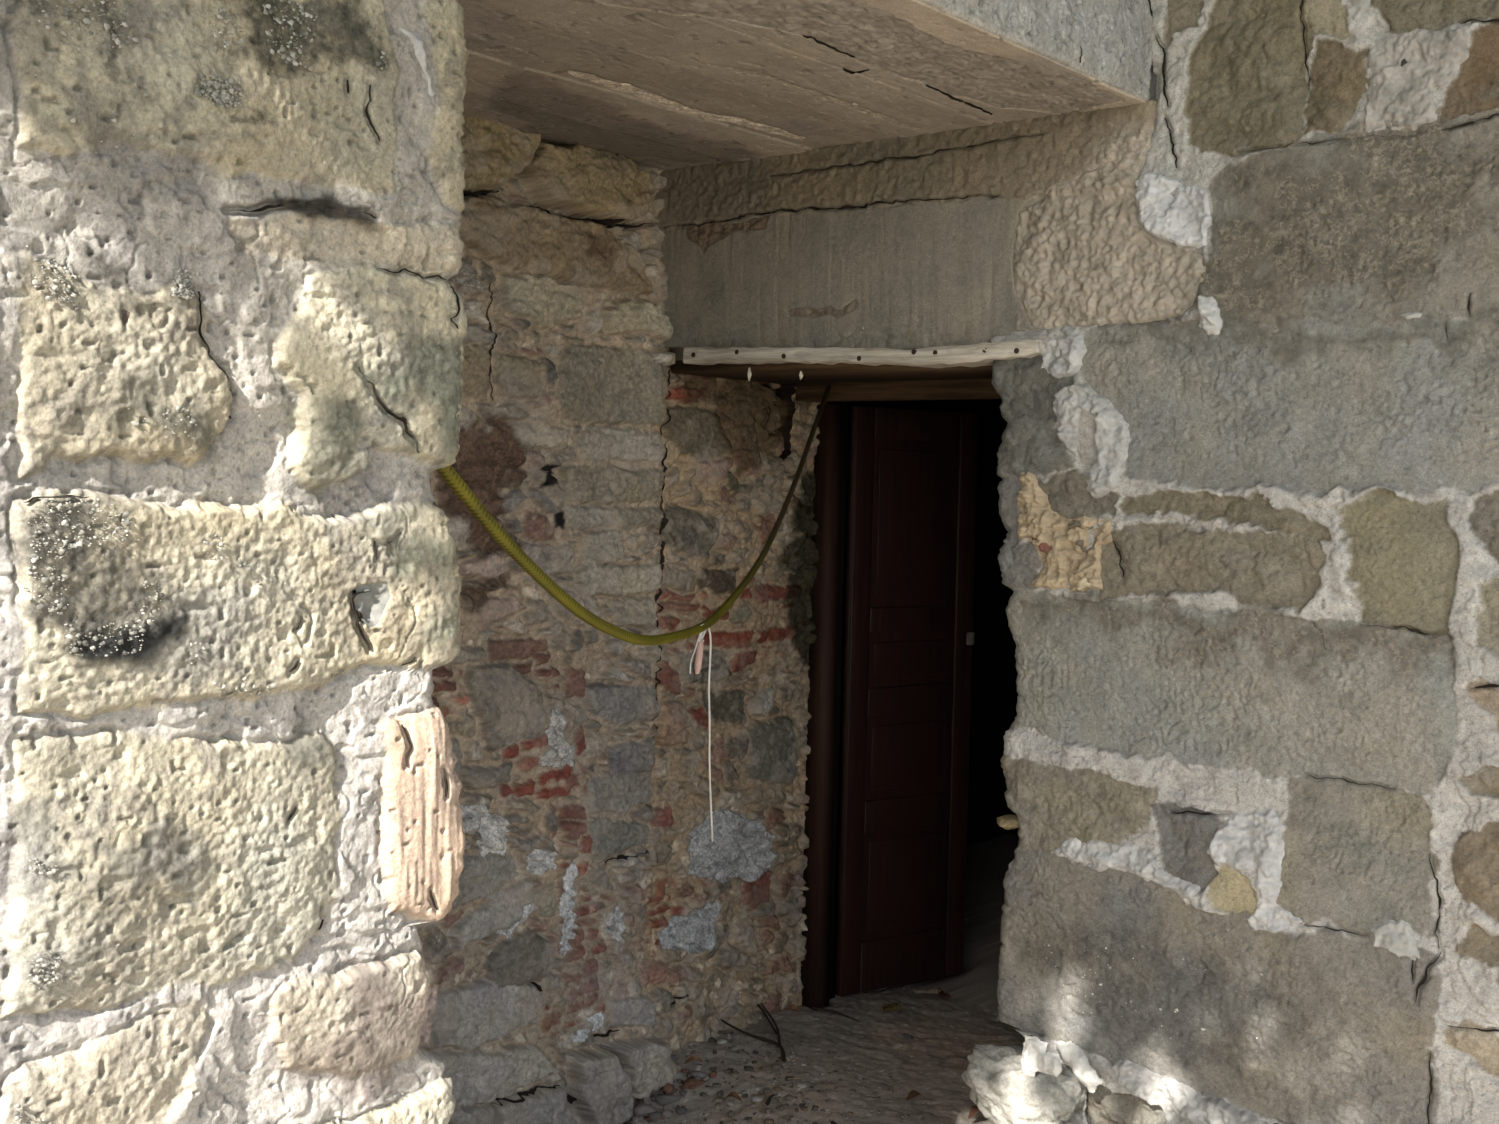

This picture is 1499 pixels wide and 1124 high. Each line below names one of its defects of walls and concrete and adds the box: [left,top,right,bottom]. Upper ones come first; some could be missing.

crack [803,35,869,74]
crack [1148,0,1177,168]
crack [1300,0,1310,83]
damp [270,195,373,226]
crack [358,367,420,453]
flaking render [1017,471,1113,592]
damp [66,614,187,662]